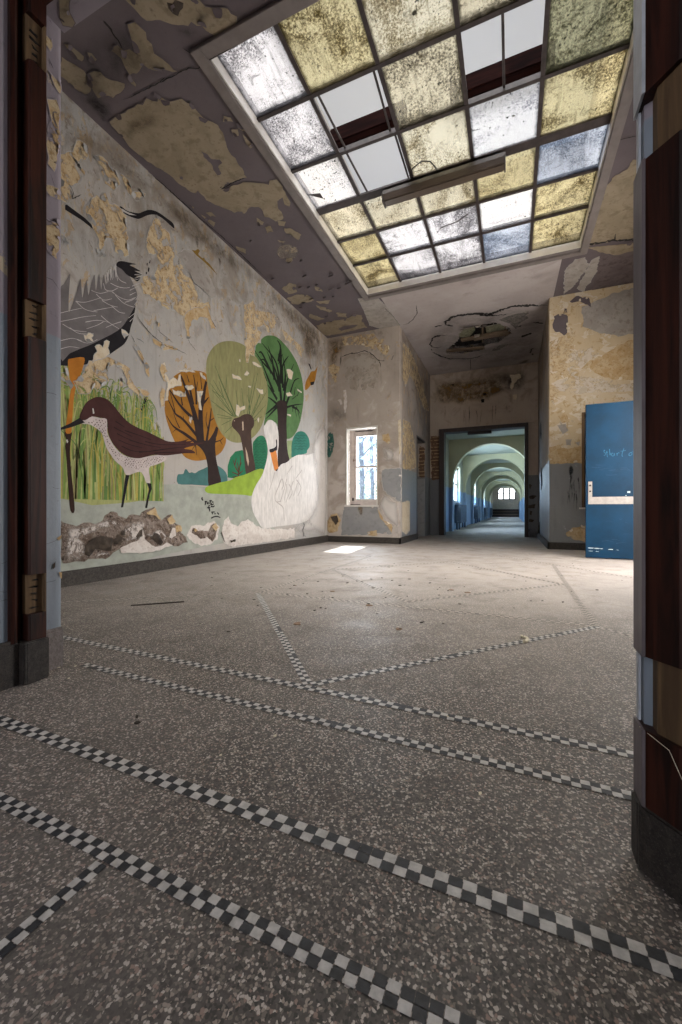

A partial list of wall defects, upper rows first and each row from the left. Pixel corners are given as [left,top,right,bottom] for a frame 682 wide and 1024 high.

peeling [46,0,238,260]
peeling [109,92,302,245]
peeling [140,216,216,339]
peeling [272,275,389,355]
crack [385,304,548,370]
peeling [459,311,529,337]
peeling [548,159,636,464]
flaking render [53,507,219,579]